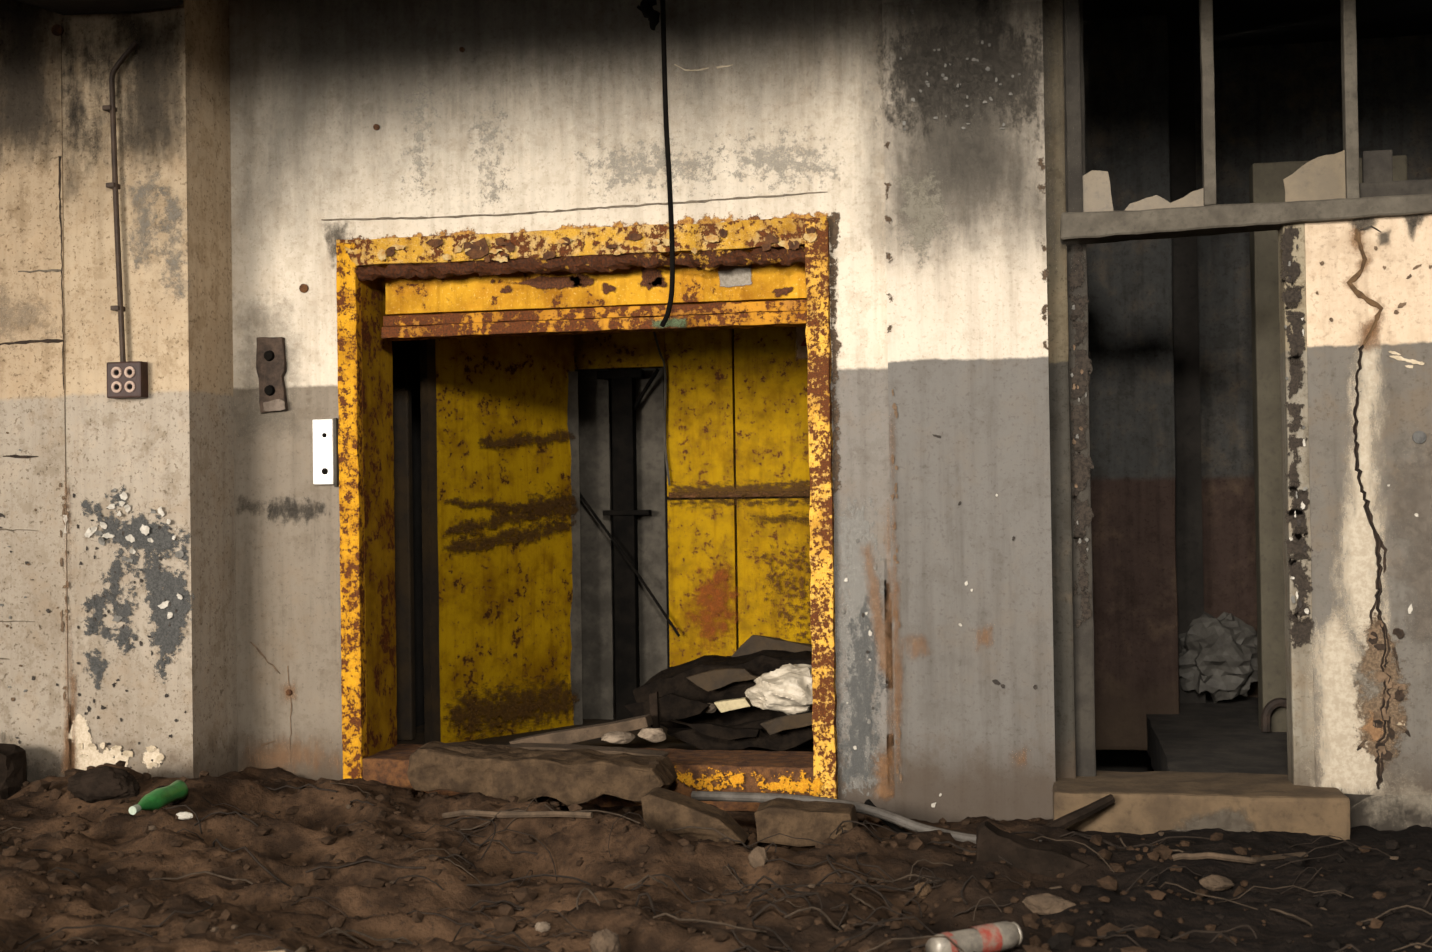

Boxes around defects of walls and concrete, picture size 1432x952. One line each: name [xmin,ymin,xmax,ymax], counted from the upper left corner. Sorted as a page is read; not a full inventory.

corrosion [491,273,616,294]
corrosion [557,221,648,230]
corrosion [640,267,667,290]
corrosion [666,211,842,493]
damp [899,175,944,258]
peeling [68,485,194,770]
corrosion [443,487,578,557]
corrosion [478,428,576,450]
corrosion [668,477,812,657]
peeling [1280,224,1319,649]
crack [1346,226,1410,789]
spalling [1354,612,1410,767]